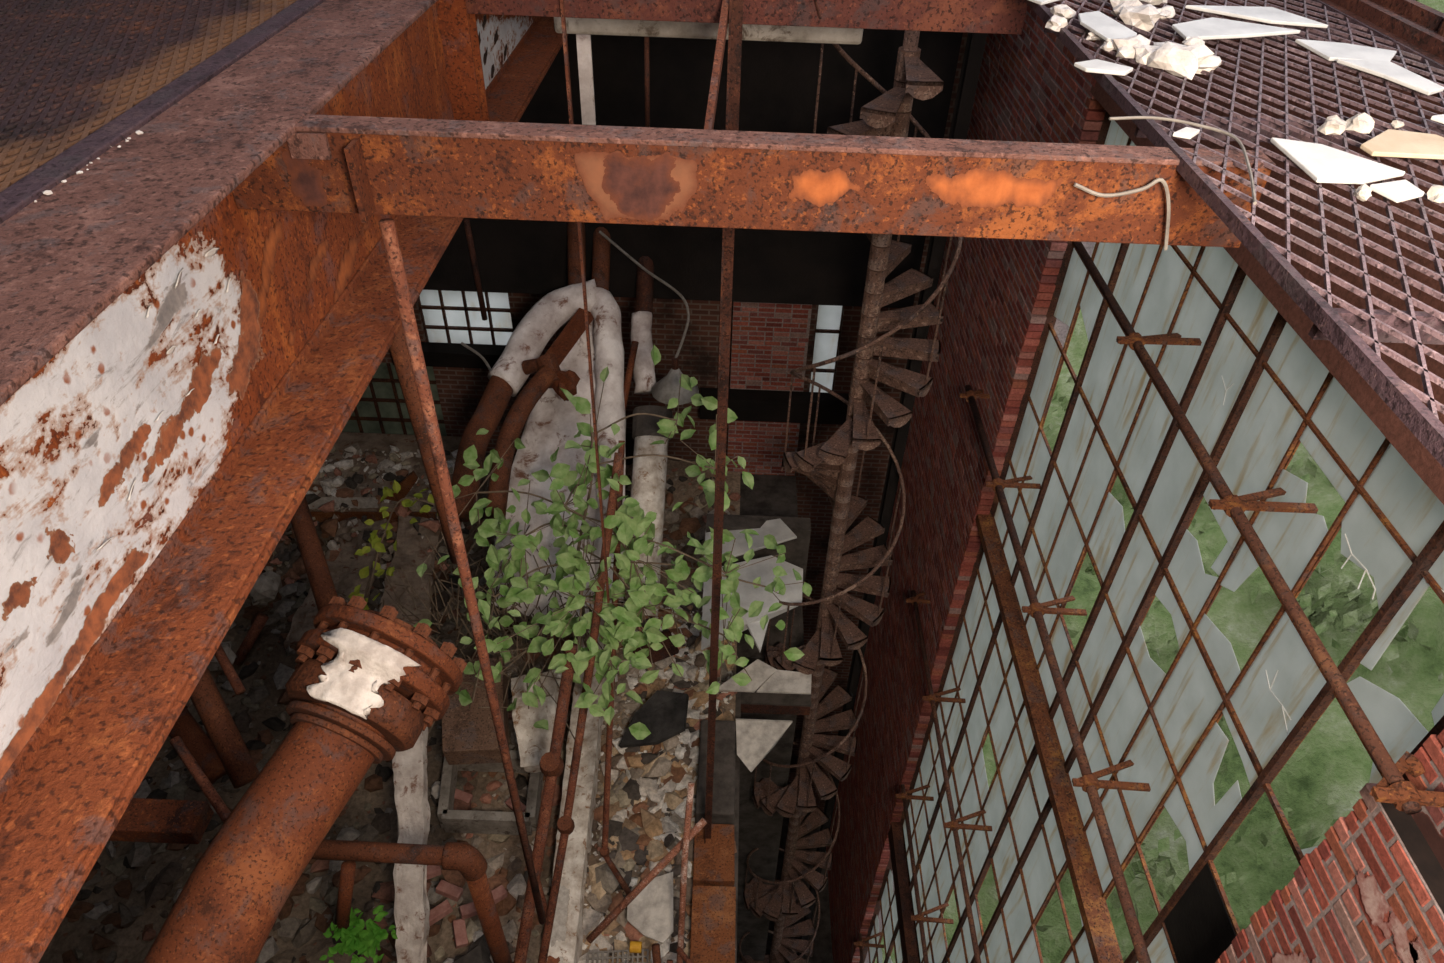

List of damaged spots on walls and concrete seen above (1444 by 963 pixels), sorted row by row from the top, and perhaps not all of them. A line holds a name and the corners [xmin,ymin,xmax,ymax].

corrosion [574,151,698,222]
corrosion [788,168,860,207]
corrosion [925,168,1062,209]
corrosion [98,216,285,507]
peeling [0,231,241,759]
corrosion [308,497,437,523]
corrosion [45,527,75,570]